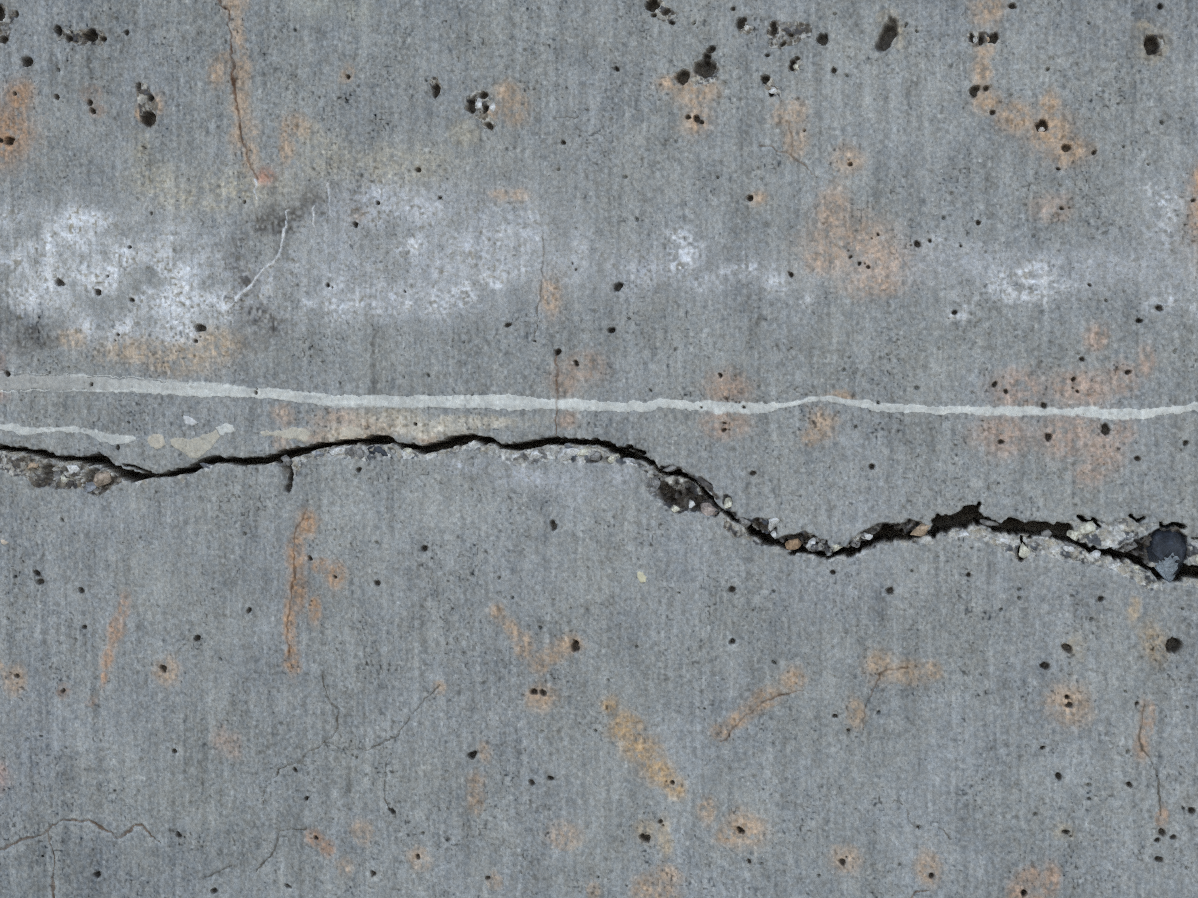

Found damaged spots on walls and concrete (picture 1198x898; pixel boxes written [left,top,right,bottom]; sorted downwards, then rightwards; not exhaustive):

corrosion [0,68,61,187]
corrosion [204,0,278,188]
water stain [0,113,1198,444]
corrosion [761,90,931,305]
corrosion [962,0,1107,228]
water stain [0,415,236,458]
water stain [427,451,640,504]
crack [0,235,1198,592]
crack [286,566,296,659]
corrosion [483,596,591,719]
corrosion [593,691,779,898]
corrosion [998,818,1078,898]